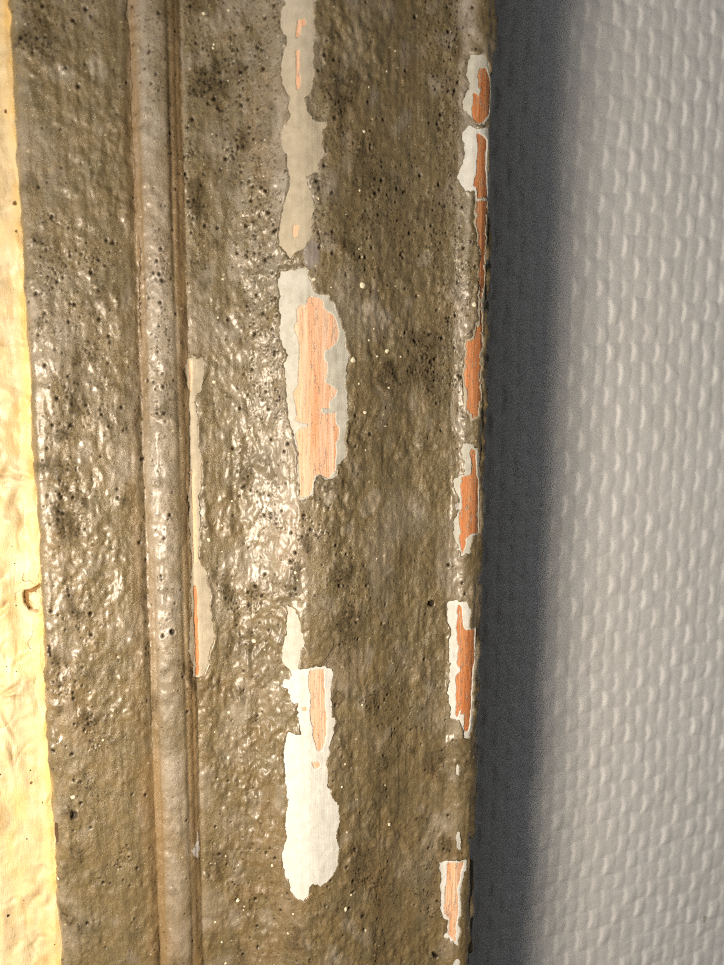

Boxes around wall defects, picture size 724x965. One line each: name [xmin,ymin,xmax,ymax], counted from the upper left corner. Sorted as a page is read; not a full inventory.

peeling [278,0,327,258]
peeling [457,54,492,422]
peeling [185,357,215,677]
peeling [278,268,349,501]
peeling [453,443,480,556]
peeling [282,605,340,901]
peeling [447,600,476,739]
peeling [439,860,467,945]